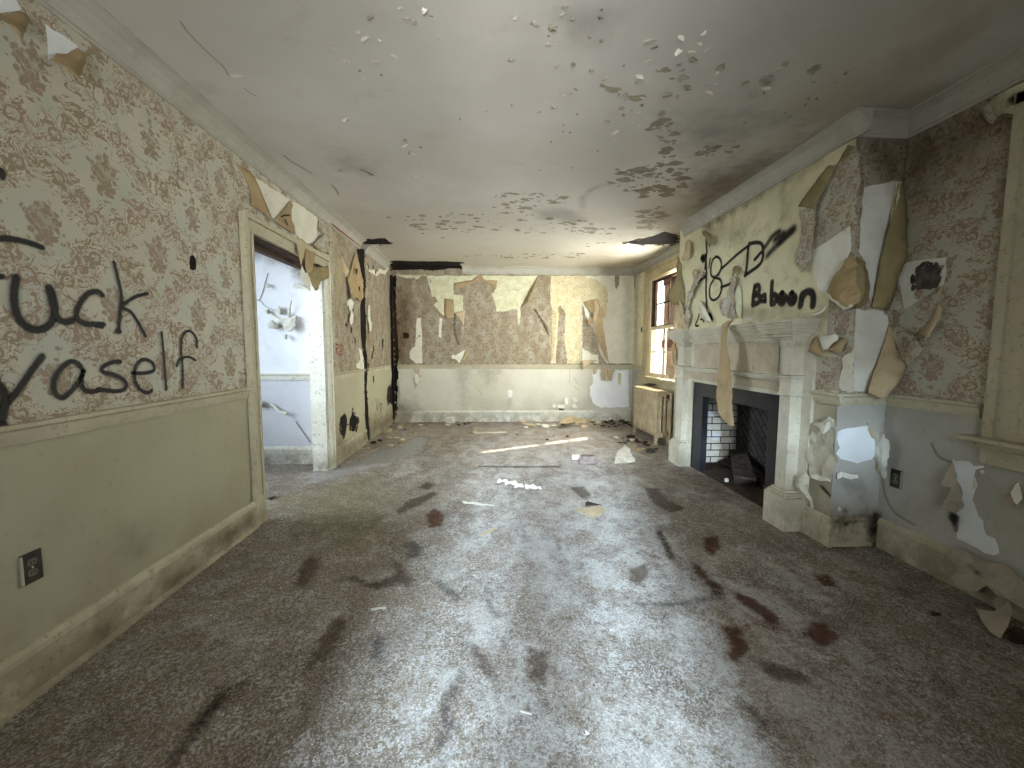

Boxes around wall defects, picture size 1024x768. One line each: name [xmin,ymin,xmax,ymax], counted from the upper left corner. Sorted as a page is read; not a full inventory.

peeling [404,30,712,259]
spalling [910,261,942,291]
crack [356,248,400,440]
peeling [552,368,629,410]
peeling [795,417,890,508]
peeling [940,460,999,555]
peeling [1001,481,1023,510]